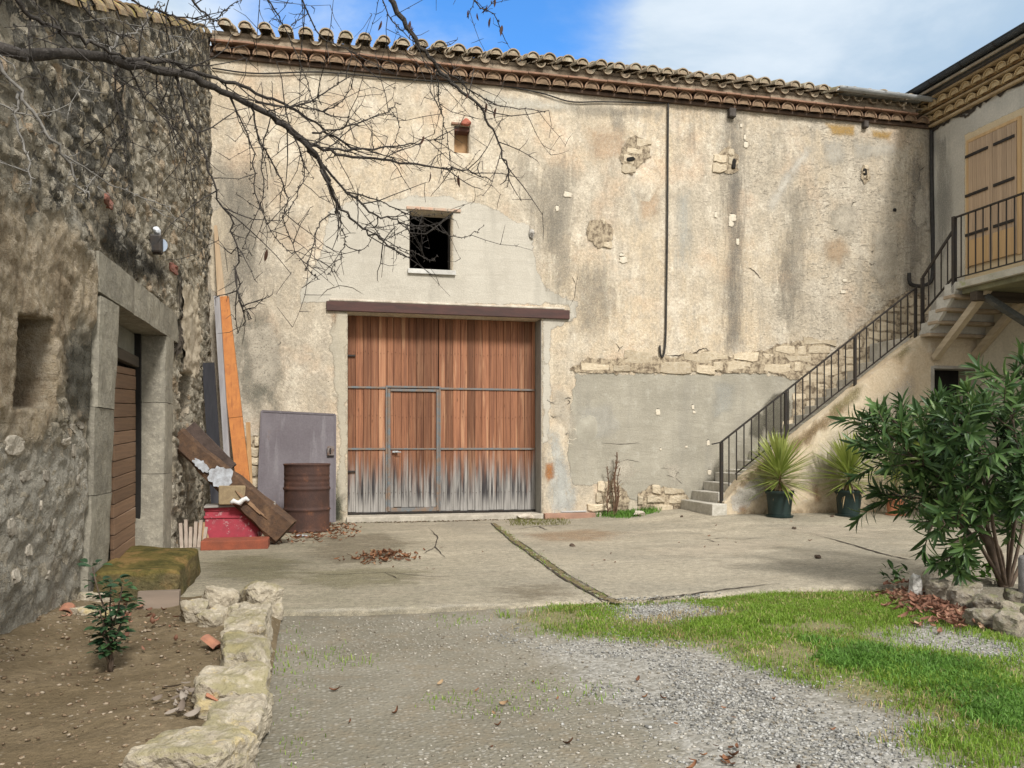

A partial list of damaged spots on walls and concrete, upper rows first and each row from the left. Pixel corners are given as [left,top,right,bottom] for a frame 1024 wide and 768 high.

spalling [619,135,651,175]
spalling [712,123,749,174]
spalling [586,219,628,264]
flaking render [570,290,931,429]